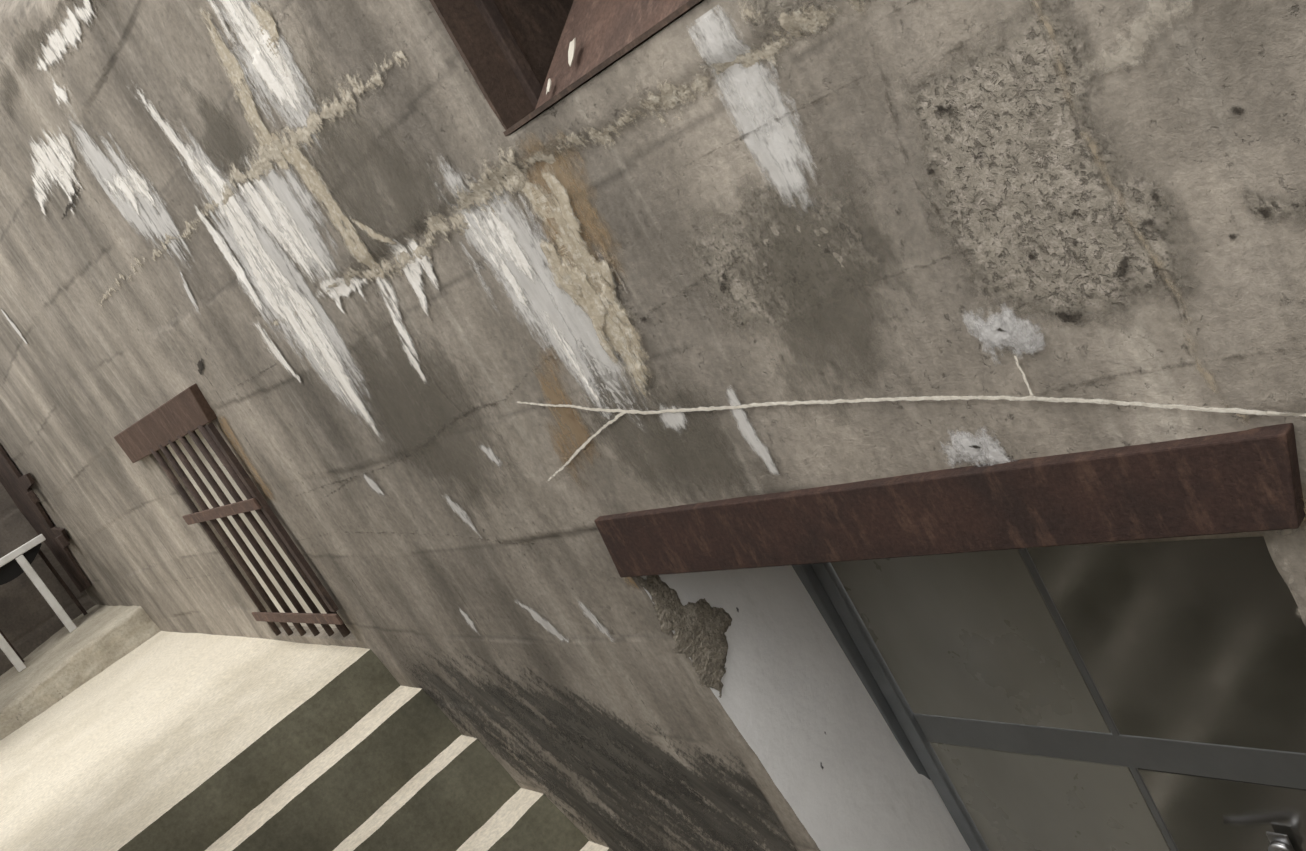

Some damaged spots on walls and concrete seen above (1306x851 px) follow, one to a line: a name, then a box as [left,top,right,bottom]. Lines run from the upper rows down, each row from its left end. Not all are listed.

water stain [1,0,94,116]
water stain [31,150,76,214]
water stain [137,0,739,507]
spalling [750,0,810,36]
water stain [690,7,873,395]
crack [424,0,1306,481]
spalling [906,5,1191,323]
peeling [637,575,739,698]